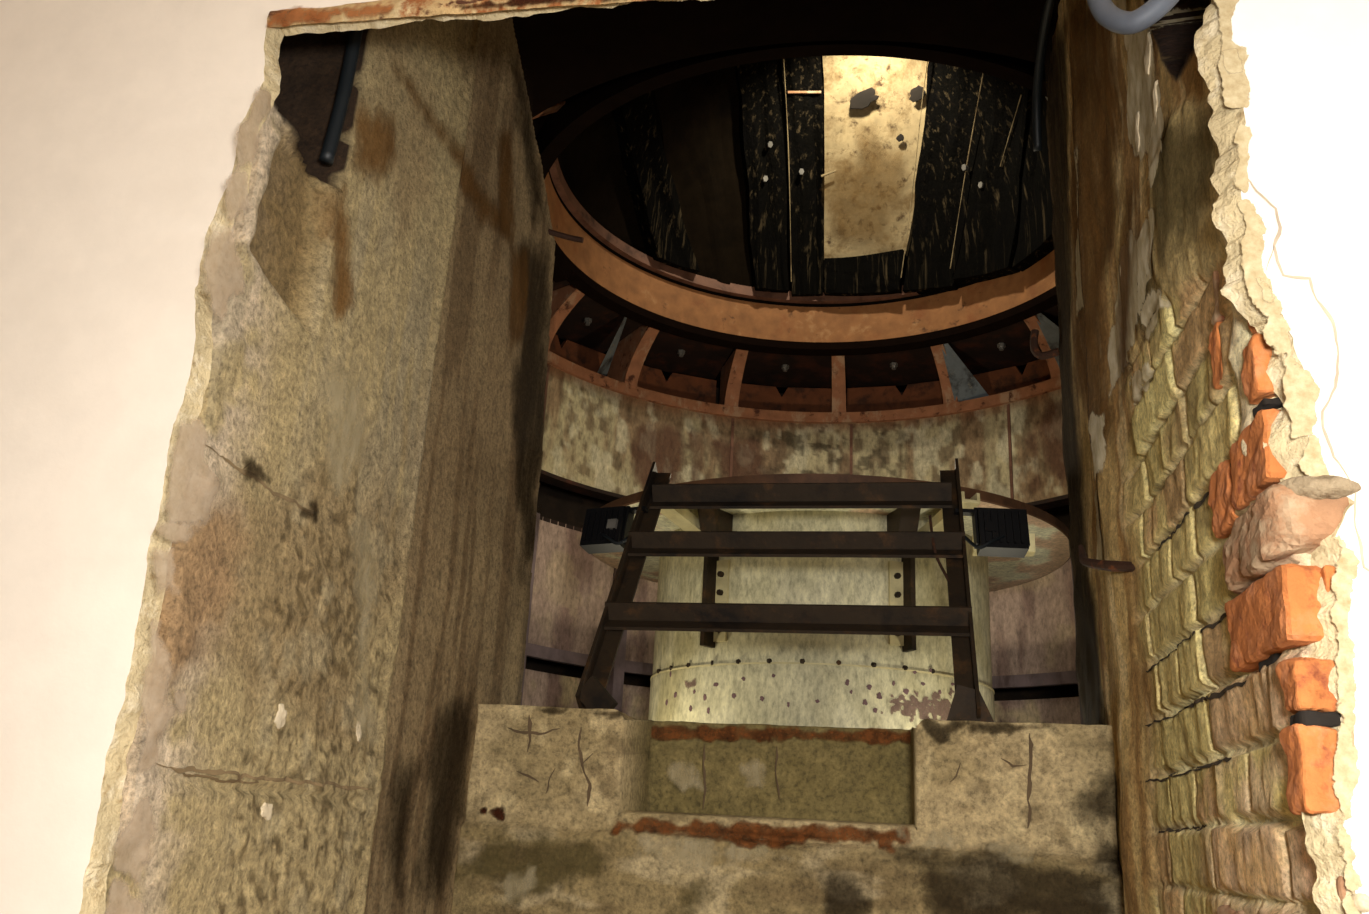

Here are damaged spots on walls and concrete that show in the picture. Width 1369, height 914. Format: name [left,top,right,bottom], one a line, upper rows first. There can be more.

corrosion [460,0,575,9]
leakage [330,204,351,316]
peeling [1108,208,1172,405]
flaking render [1124,0,1329,539]
crack [1248,178,1369,572]
crack [508,715,593,807]
corrosion [651,668,955,745]
crack [1145,680,1247,727]
spalling [1224,535,1363,914]
corrosion [611,817,911,852]
leakage [825,875,870,914]
leakage [913,783,1124,914]